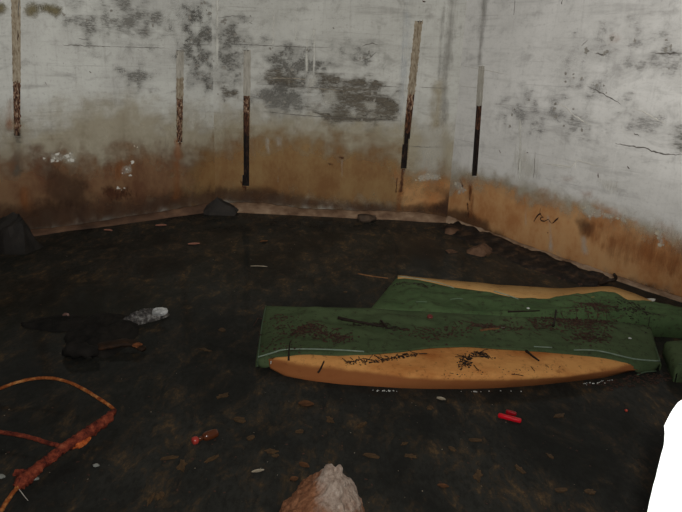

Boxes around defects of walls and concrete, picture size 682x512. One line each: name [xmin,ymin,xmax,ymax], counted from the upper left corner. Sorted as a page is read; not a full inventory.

rust [13,79,22,143]
rust [404,90,415,134]
crack [615,133,682,155]
damp [0,113,682,297]